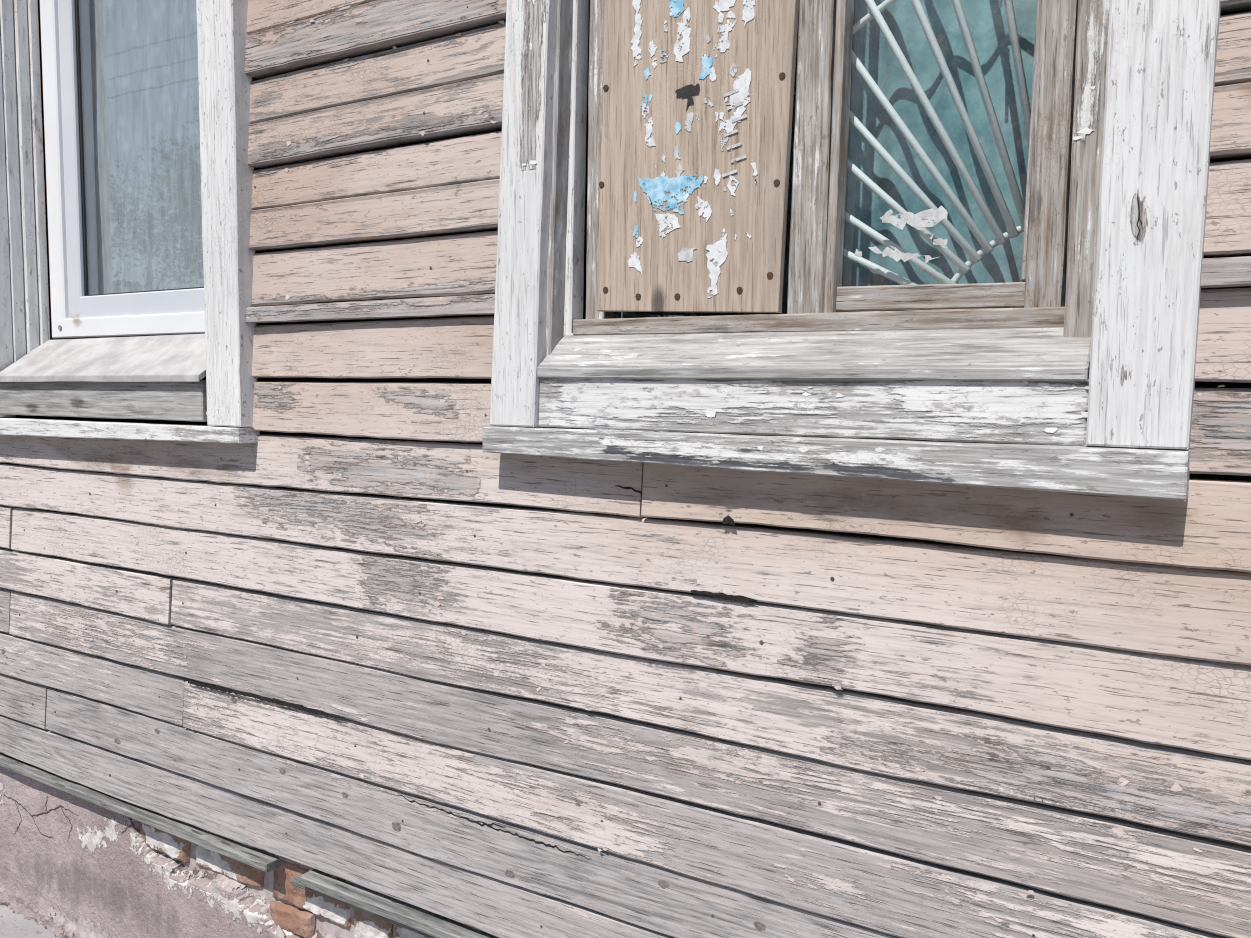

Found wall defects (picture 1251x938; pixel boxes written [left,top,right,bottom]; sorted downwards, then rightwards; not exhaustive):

peeling [1073,0,1110,143]
peeling [538,378,954,479]
peeling [885,379,1089,443]
peeling [44,601,680,866]
peeling [233,442,1251,938]
crack [2,794,78,838]
spalling [77,813,429,938]
crack [397,795,585,857]